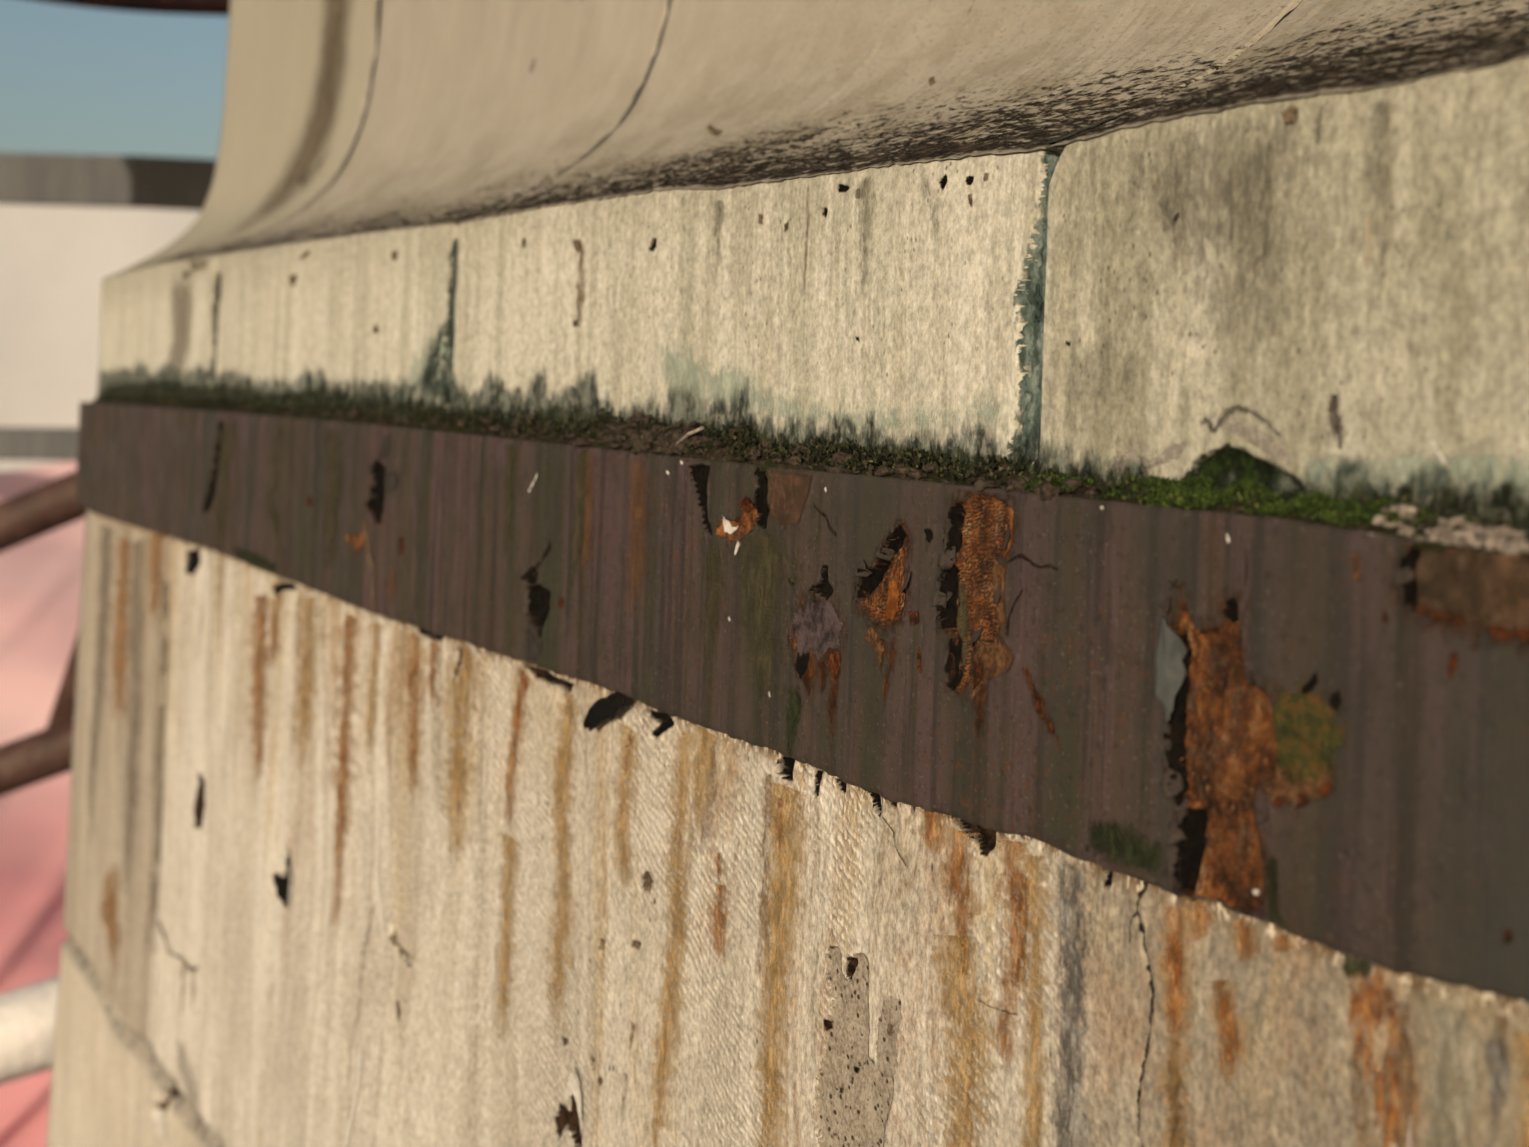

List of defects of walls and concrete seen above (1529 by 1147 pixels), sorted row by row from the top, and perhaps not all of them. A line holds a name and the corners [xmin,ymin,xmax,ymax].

corrosion [688,465,812,554]
corrosion [786,489,1058,755]
corrosion [1392,543,1529,654]
spalling [273,845,293,907]
corrosion [1154,585,1347,1147]
spalling [555,1057,603,1147]
peeling [811,946,901,1147]
leakage [1050,859,1091,1147]
crack [1129,882,1155,1147]